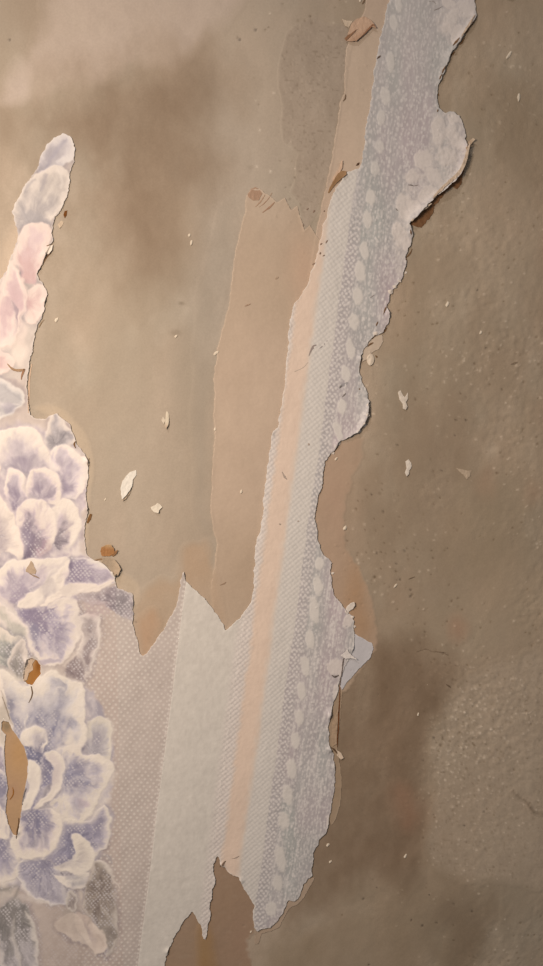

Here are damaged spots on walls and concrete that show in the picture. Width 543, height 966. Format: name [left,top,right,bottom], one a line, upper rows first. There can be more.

peeling [94,545,121,577]
peeling [120,470,136,501]
damp [0,0,279,656]
damp [279,608,512,966]